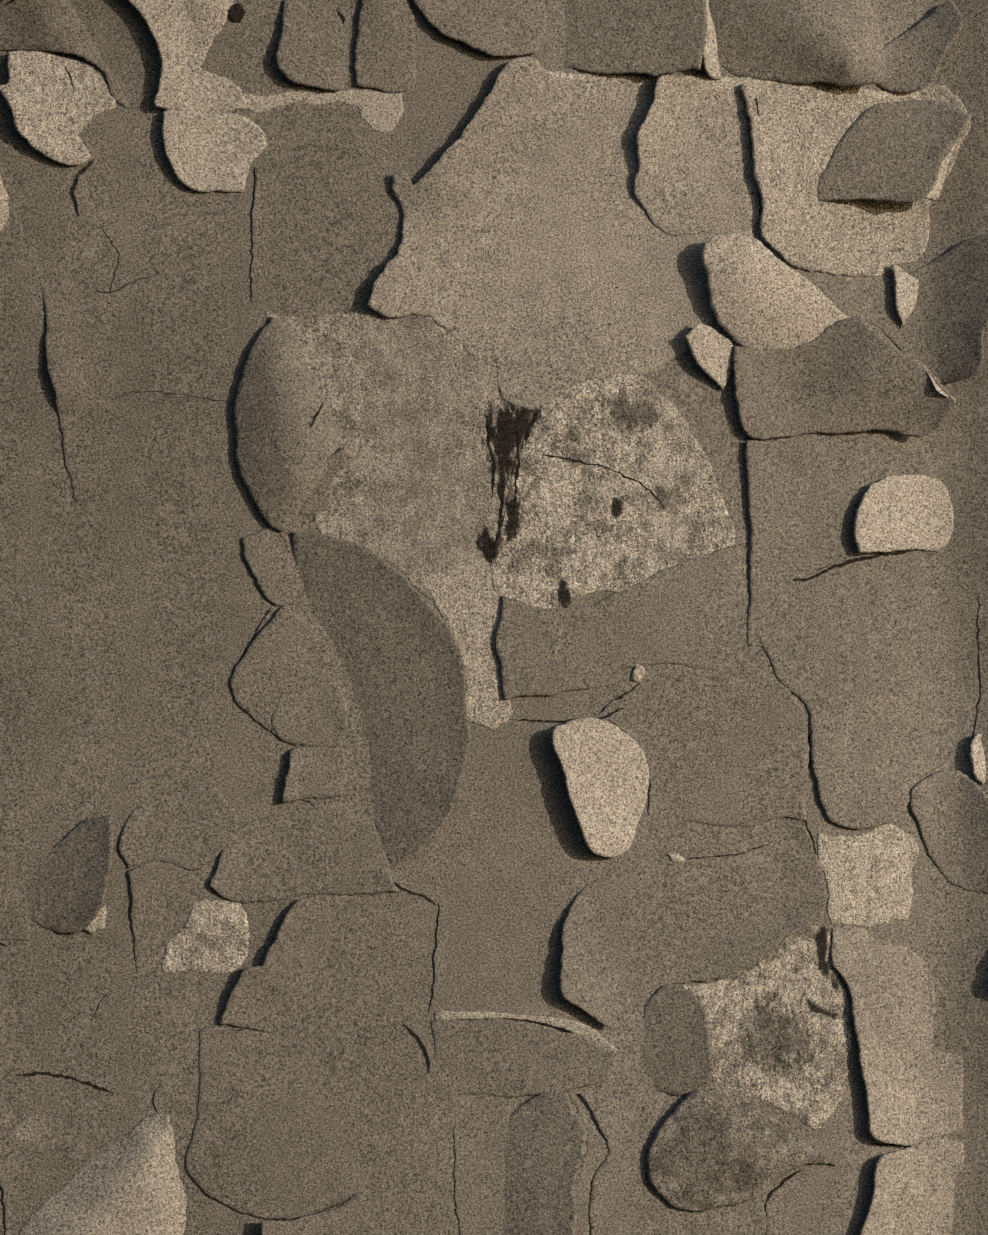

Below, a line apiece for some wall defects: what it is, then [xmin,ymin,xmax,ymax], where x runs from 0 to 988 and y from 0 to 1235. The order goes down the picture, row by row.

peeling [0,175,9,232]
crack [249,167,280,303]
peeling [0,257,116,505]
peeling [118,306,521,973]
peeling [366,0,988,1235]
crack [16,1072,113,1094]
peeling [18,1113,187,1235]
peeling [185,897,375,1235]